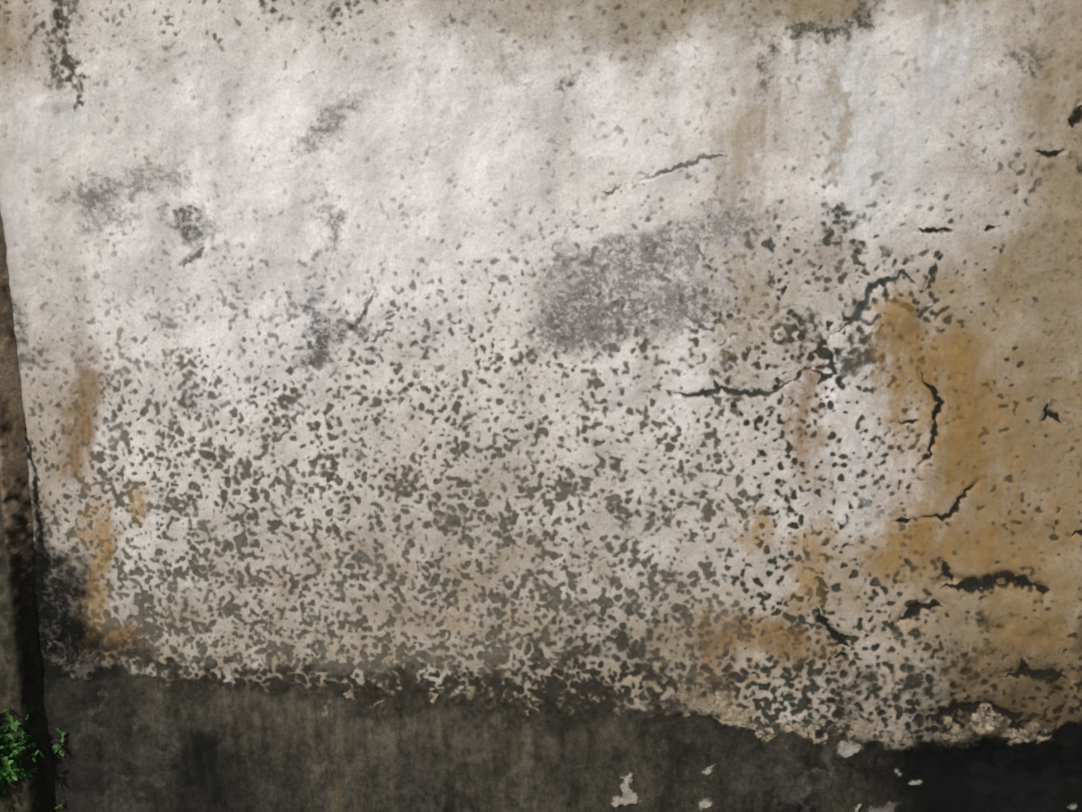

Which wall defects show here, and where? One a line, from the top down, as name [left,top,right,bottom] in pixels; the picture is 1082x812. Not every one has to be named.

crack [600,153,727,194]
peeling [1014,153,1042,204]
crack [674,368,839,397]
crack [898,371,944,462]
peeling [31,214,1082,747]
crack [895,480,978,523]
water stain [29,488,703,721]
crack [895,561,1050,623]
water stain [832,628,939,719]
water stain [897,611,1082,812]